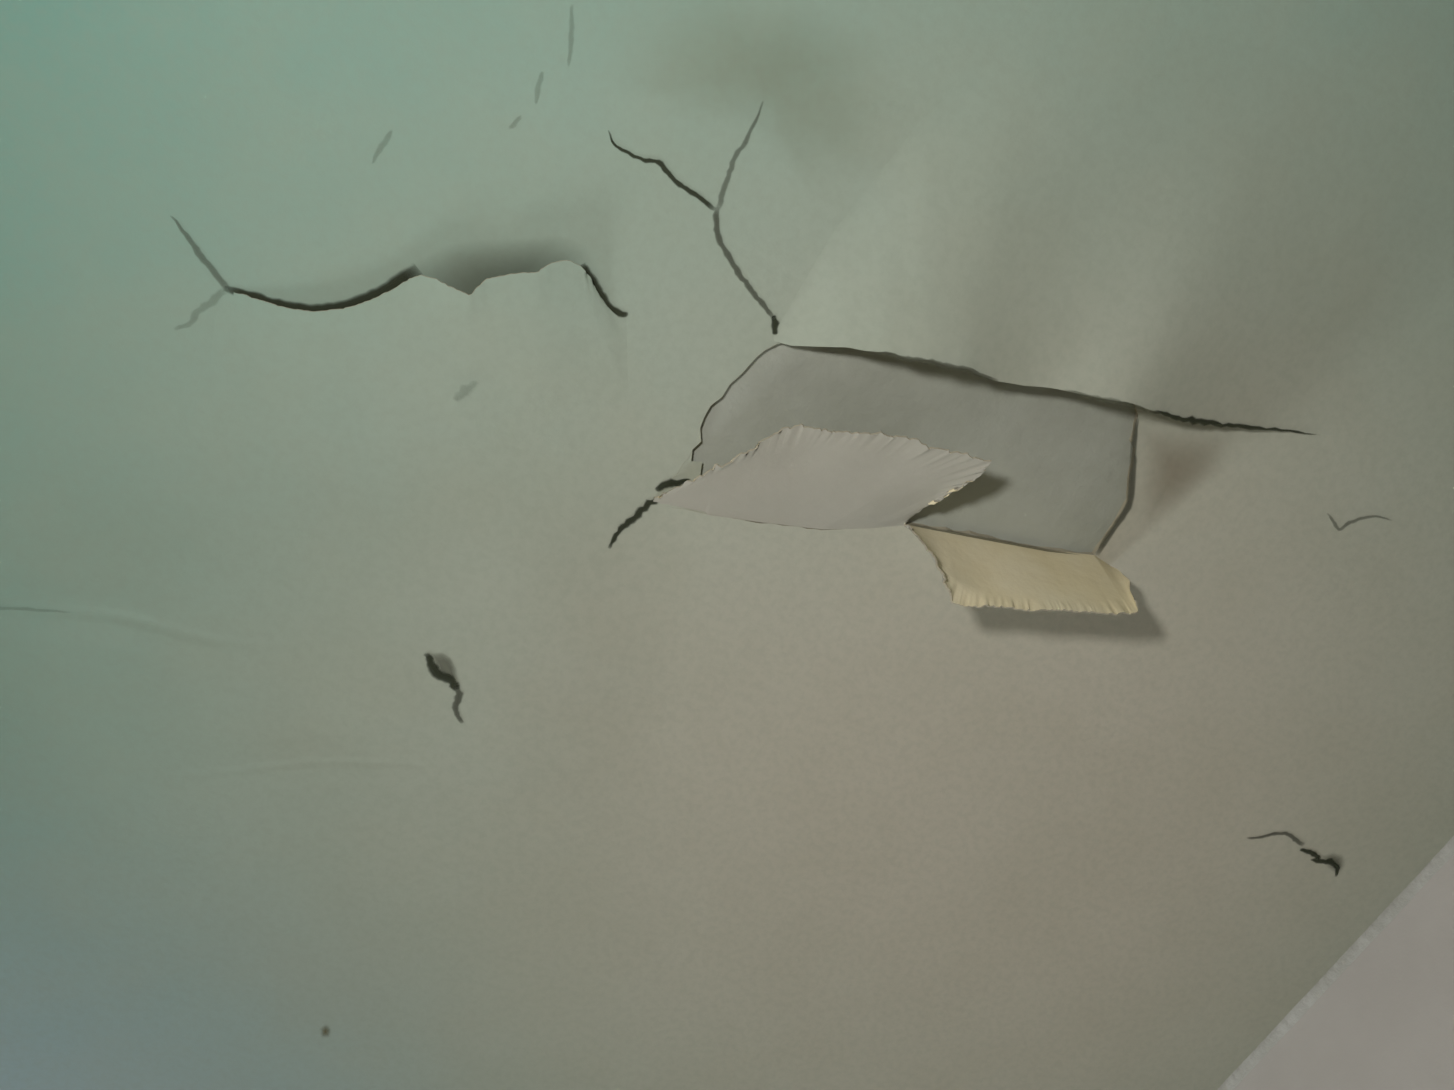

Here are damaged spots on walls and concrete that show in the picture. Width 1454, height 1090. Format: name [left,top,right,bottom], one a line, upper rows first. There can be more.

crack [610,134,779,334]
peeling [609,22,1445,616]
crack [1250,832,1340,876]